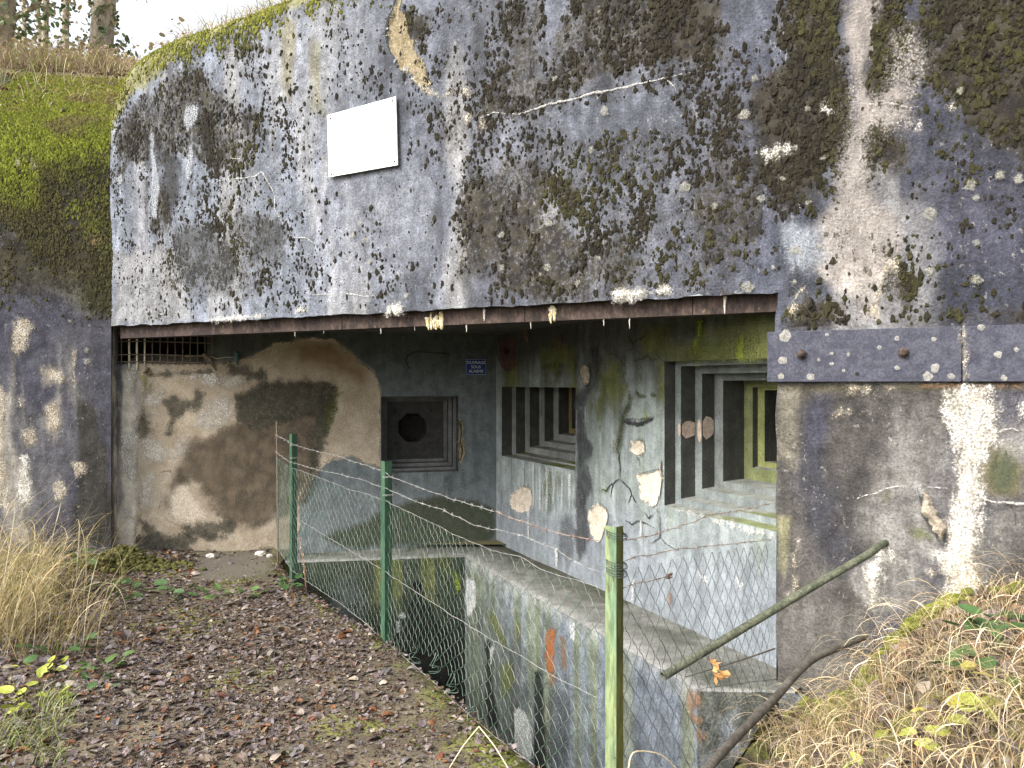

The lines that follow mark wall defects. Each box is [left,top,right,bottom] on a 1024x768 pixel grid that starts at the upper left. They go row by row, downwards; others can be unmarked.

spalling [384,0,452,95]
crack [480,74,682,118]
damp [822,26,924,317]
damp [612,290,643,301]
damp [111,361,340,550]
spalling [509,485,532,513]
spalling [587,503,608,542]
crack [596,335,674,549]
spalling [630,438,662,508]
peeling [678,416,714,442]
damp [929,333,1003,603]
corrosion [545,629,566,685]